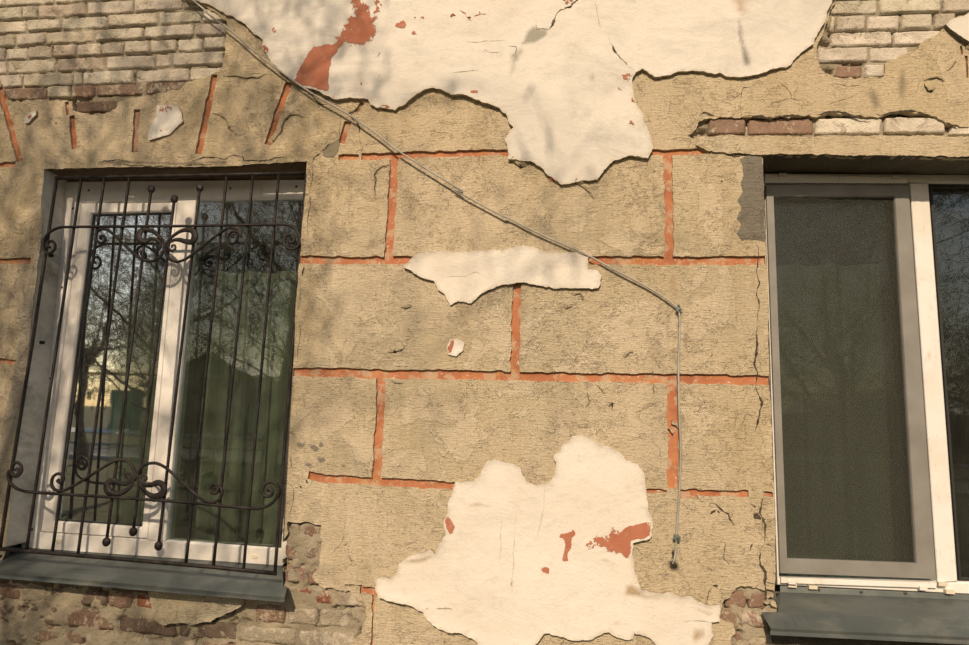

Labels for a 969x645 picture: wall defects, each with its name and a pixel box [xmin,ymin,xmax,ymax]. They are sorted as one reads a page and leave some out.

peeling [0,0,969,186]
crack [753,244,763,432]
peeling [0,434,783,645]
crack [697,496,776,623]